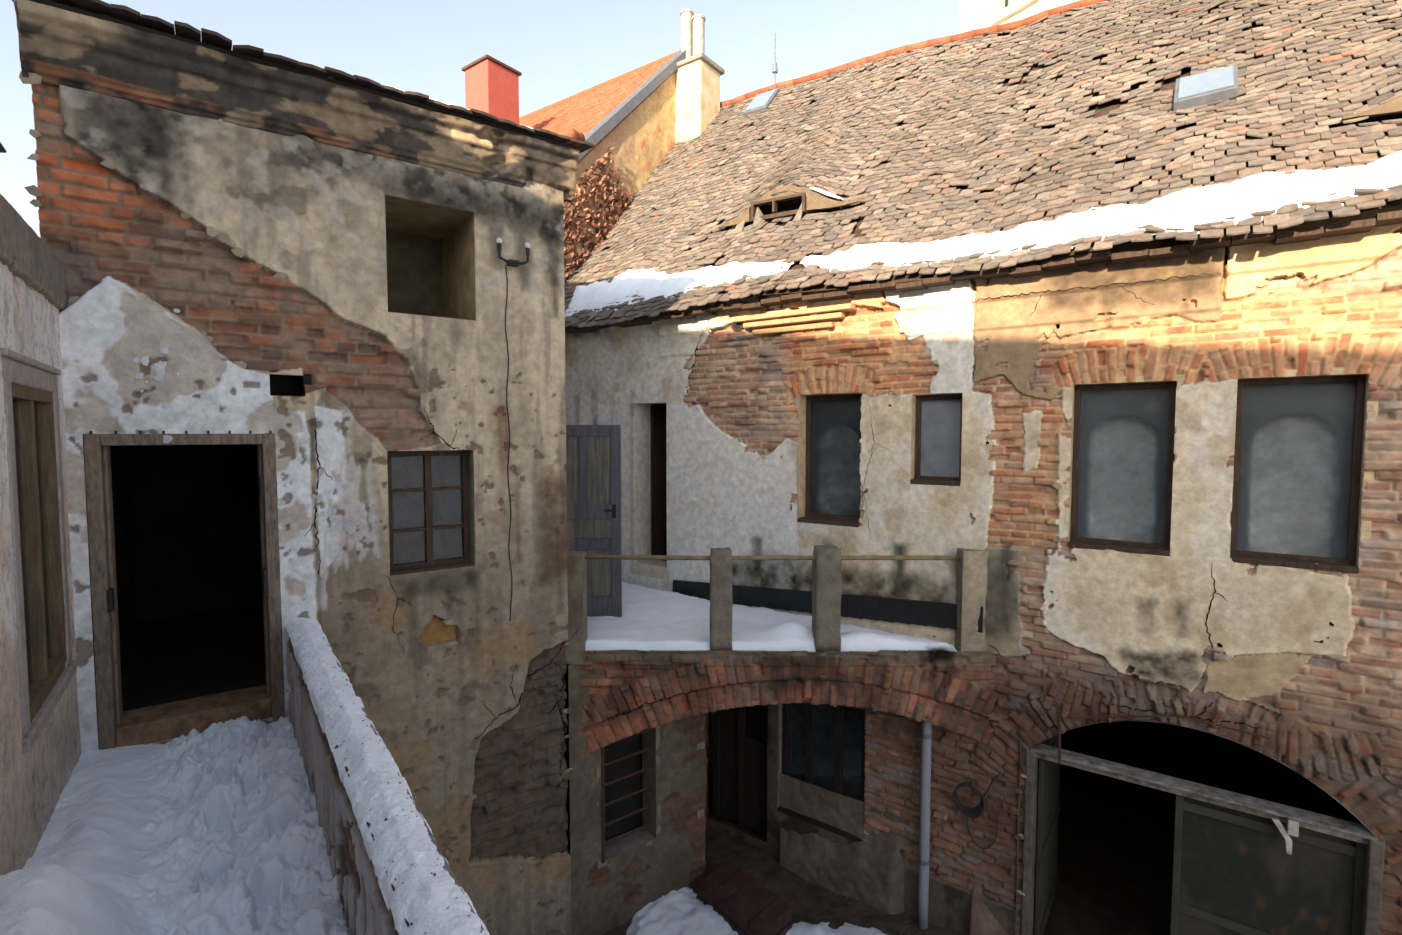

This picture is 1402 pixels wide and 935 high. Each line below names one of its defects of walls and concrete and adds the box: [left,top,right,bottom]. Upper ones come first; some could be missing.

spalling [19,71,441,451]
spalling [682,293,939,458]
spalling [420,615,459,645]
spalling [863,227,1402,935]
crack [1205,567,1229,656]